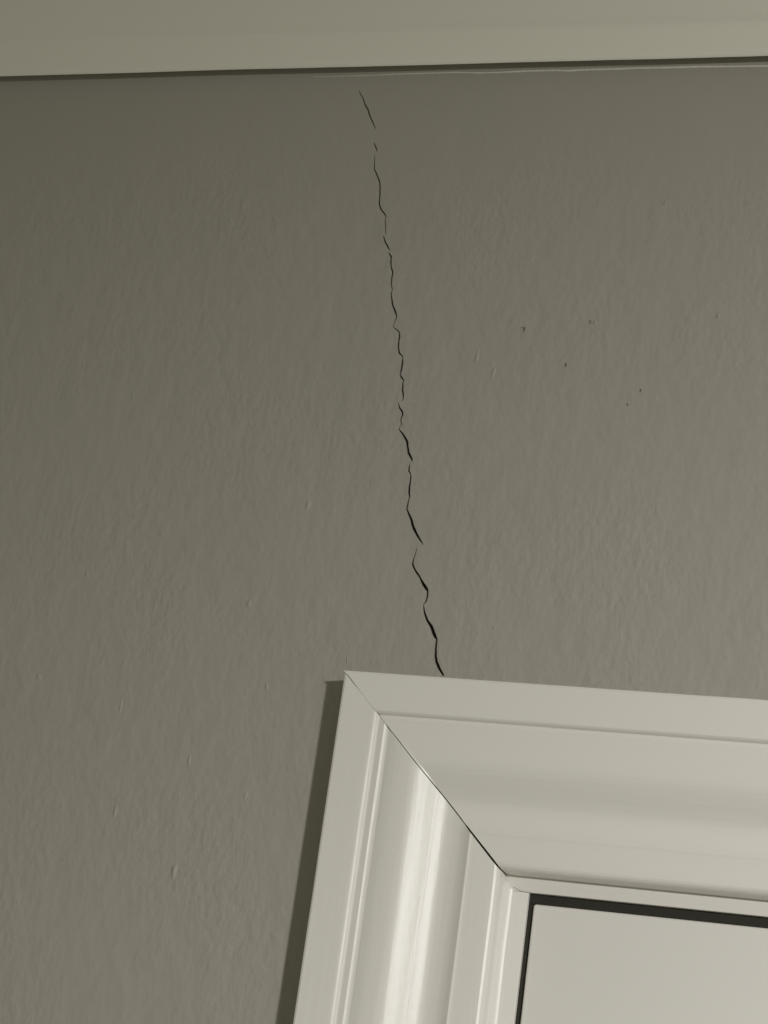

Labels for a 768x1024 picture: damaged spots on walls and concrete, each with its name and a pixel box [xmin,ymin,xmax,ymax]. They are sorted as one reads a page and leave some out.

crack [359,91,444,676]